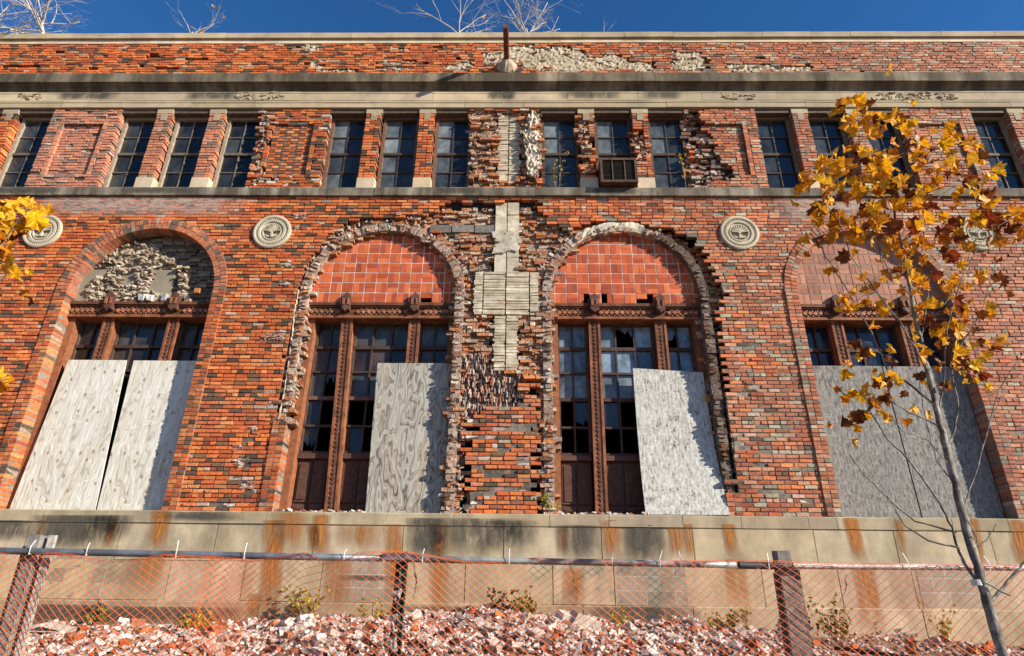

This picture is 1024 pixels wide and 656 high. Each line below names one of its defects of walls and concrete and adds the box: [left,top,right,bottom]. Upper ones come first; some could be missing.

peeling [440,43,653,72]
peeling [670,51,706,71]
spalling [235,91,285,186]
spalling [466,108,545,187]
spalling [679,113,731,188]
spalling [260,202,737,515]
corrosion [142,510,168,578]
corrosion [249,512,329,617]
damp [411,518,527,552]
corrosion [604,520,620,551]
corrosion [669,524,694,553]
corrosion [844,518,863,555]